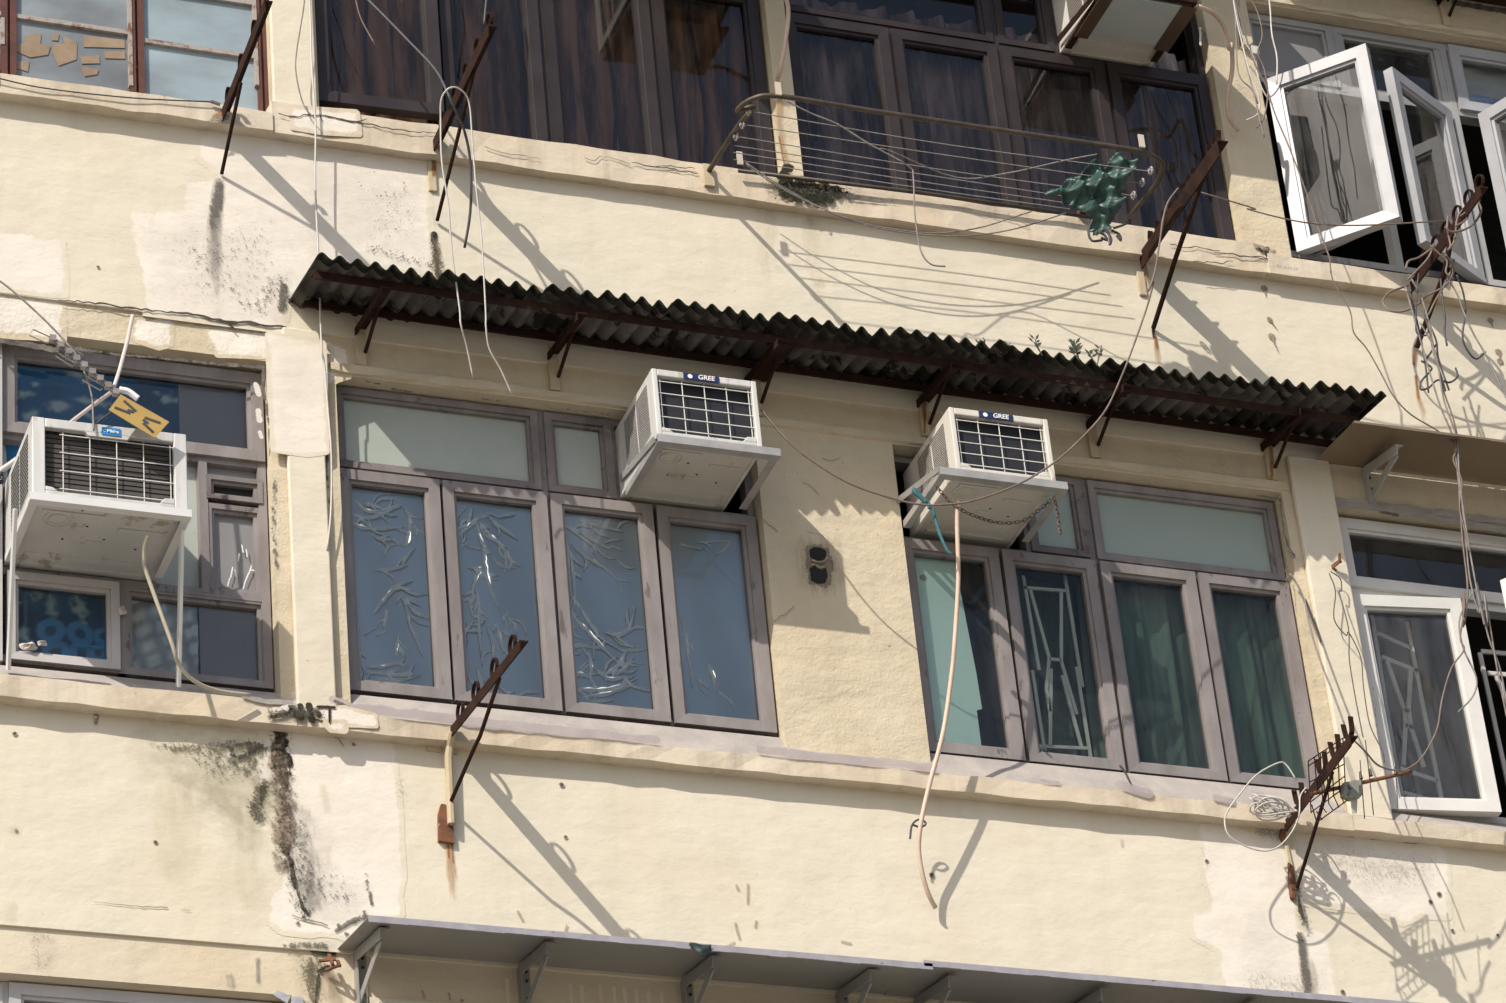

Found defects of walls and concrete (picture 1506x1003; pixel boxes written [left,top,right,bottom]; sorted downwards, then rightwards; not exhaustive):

water stain [209,178,224,264]
water stain [277,282,300,312]
mould [158,702,336,920]
corrosion [446,844,455,879]
water stain [1293,885,1312,993]